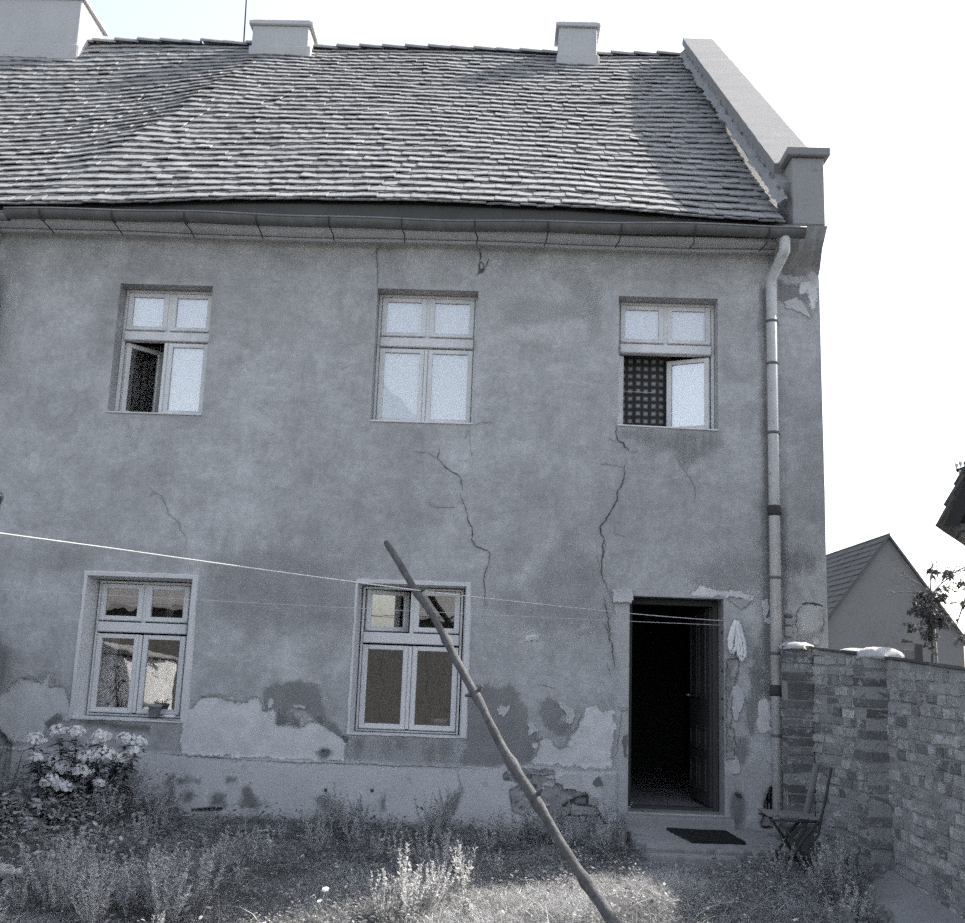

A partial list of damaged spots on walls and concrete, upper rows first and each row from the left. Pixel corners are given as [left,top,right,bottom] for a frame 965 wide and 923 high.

peeling [778,271,819,318]
crack [414,447,490,600]
crack [597,428,638,678]
peeling [0,672,71,754]
peeling [178,681,348,764]
peeling [460,589,634,827]
peeling [725,658,745,774]
peeling [755,698,772,764]